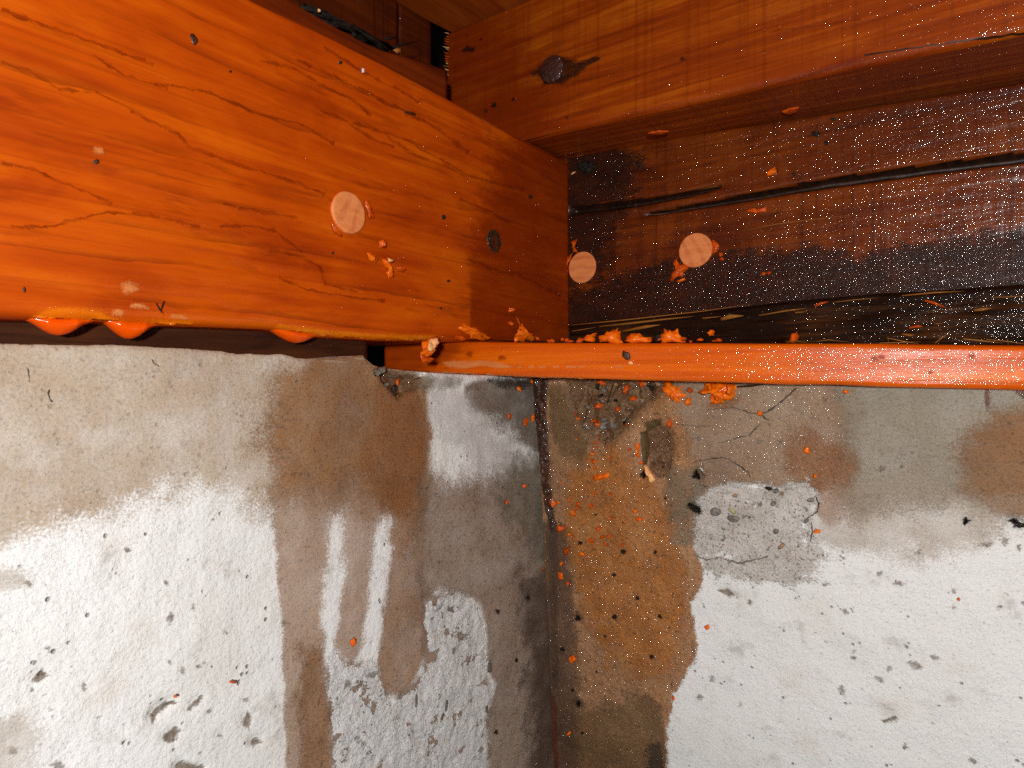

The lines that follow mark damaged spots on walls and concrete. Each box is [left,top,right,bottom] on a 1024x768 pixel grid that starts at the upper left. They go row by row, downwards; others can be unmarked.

crack [688,388,797,487]
damp [666,381,1024,530]
damp [0,344,558,768]
rust [533,377,704,768]
crack [693,555,768,564]
spalling [690,477,842,604]